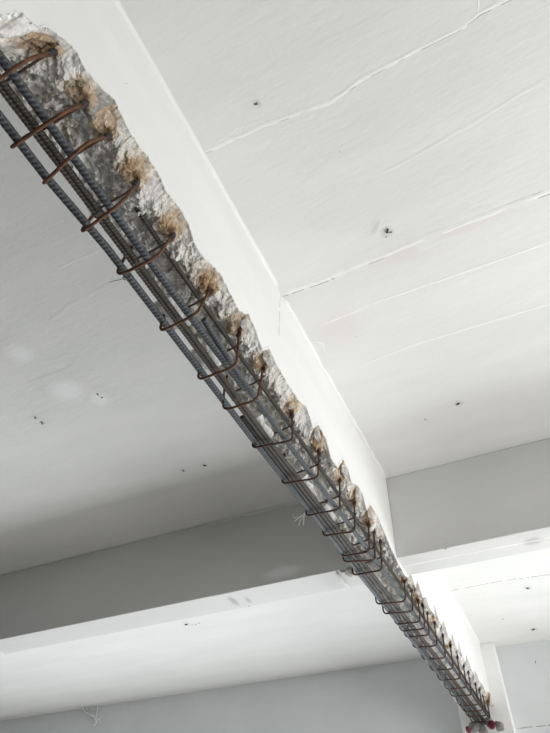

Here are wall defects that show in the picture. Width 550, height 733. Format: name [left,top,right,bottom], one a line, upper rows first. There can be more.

spalling [0,65,90,167]
spalling [0,10,109,95]
rust [0,16,194,259]
crack [203,0,511,153]
crack [281,208,506,297]
spalling [0,110,494,725]
rust [301,426,377,532]
rust [396,576,422,605]